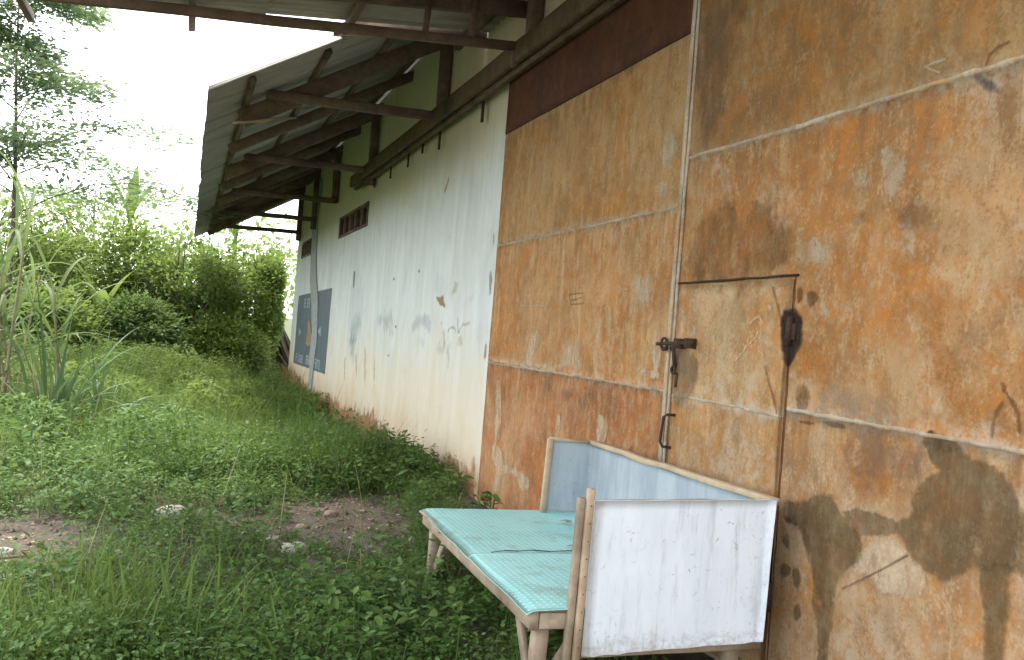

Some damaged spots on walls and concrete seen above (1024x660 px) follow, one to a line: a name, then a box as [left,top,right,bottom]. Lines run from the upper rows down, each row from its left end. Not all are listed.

rust [780,309,802,366]